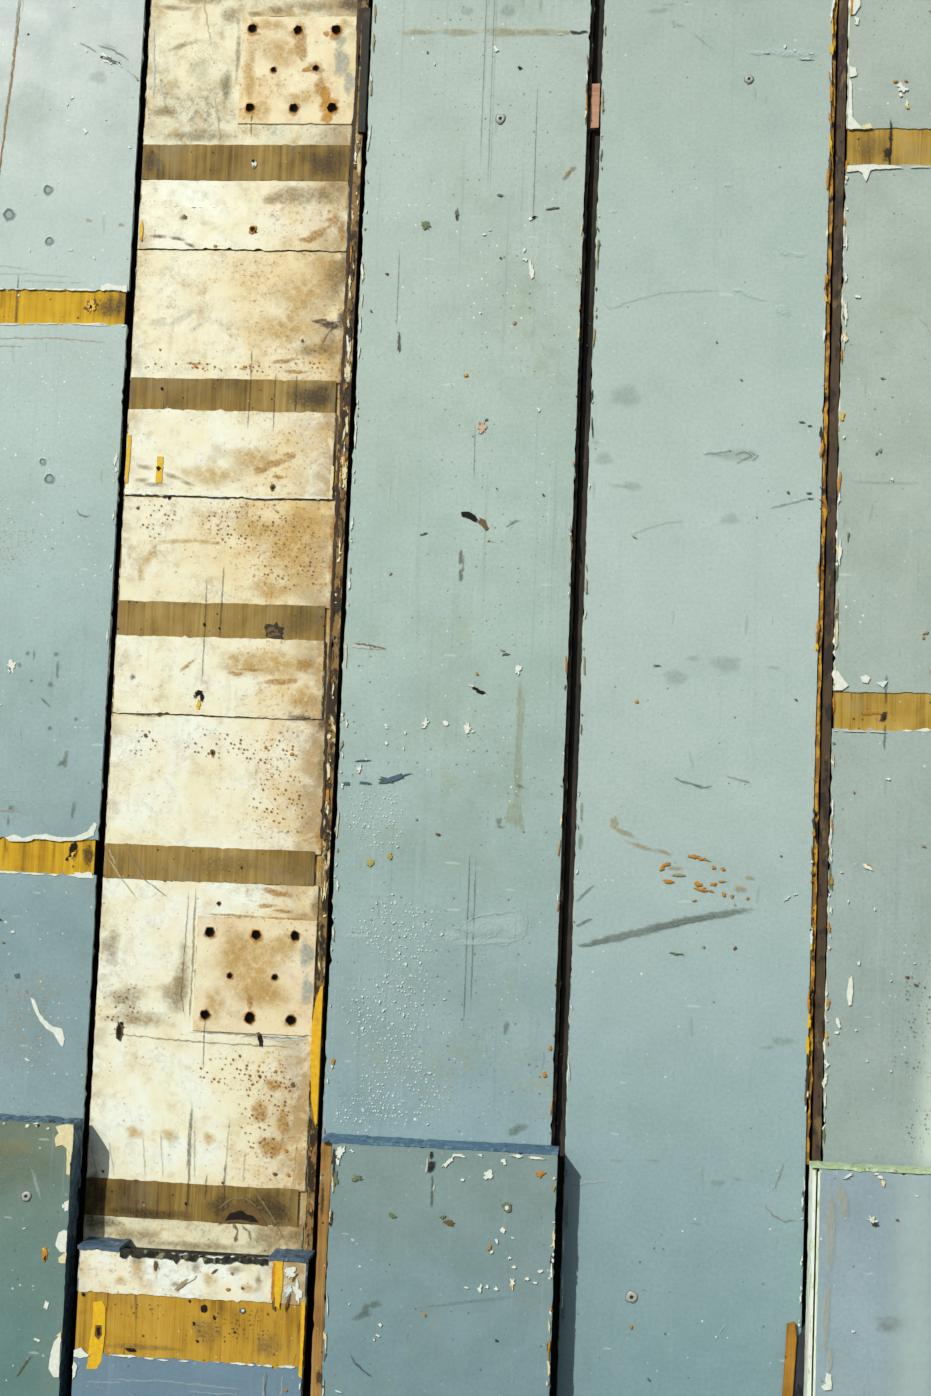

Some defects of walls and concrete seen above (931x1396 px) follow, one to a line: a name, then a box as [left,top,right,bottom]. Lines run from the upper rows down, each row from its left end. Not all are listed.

corrosion [248,12,338,123]
peeling [826,0,930,190]
corrosion [203,504,338,593]
corrosion [232,658,310,699]
corrosion [187,732,304,833]
peeling [0,823,97,878]
corrosion [215,889,301,920]
corrosion [659,854,749,905]
peeling [810,800,849,958]
peeling [804,961,860,1140]
corrosion [200,1053,295,1177]
peeling [55,1230,67,1263]